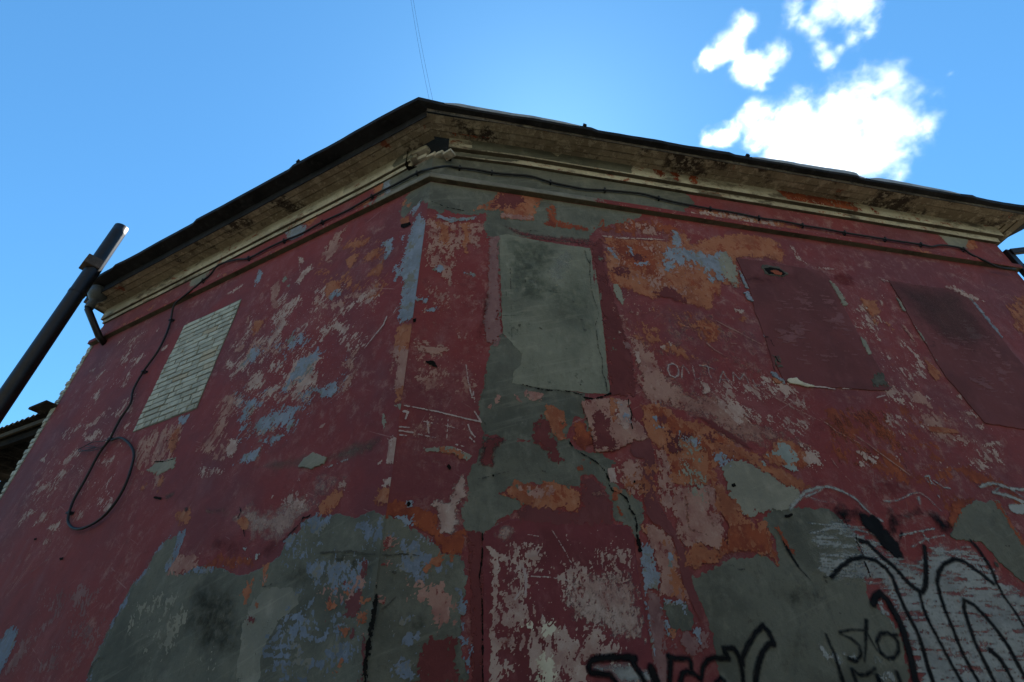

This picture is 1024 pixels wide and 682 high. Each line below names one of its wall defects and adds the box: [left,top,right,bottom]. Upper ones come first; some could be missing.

peeling [18,192,826,682]
crack [522,251,642,552]
peeling [819,267,1024,515]
crack [320,550,420,682]
crack [477,533,485,682]